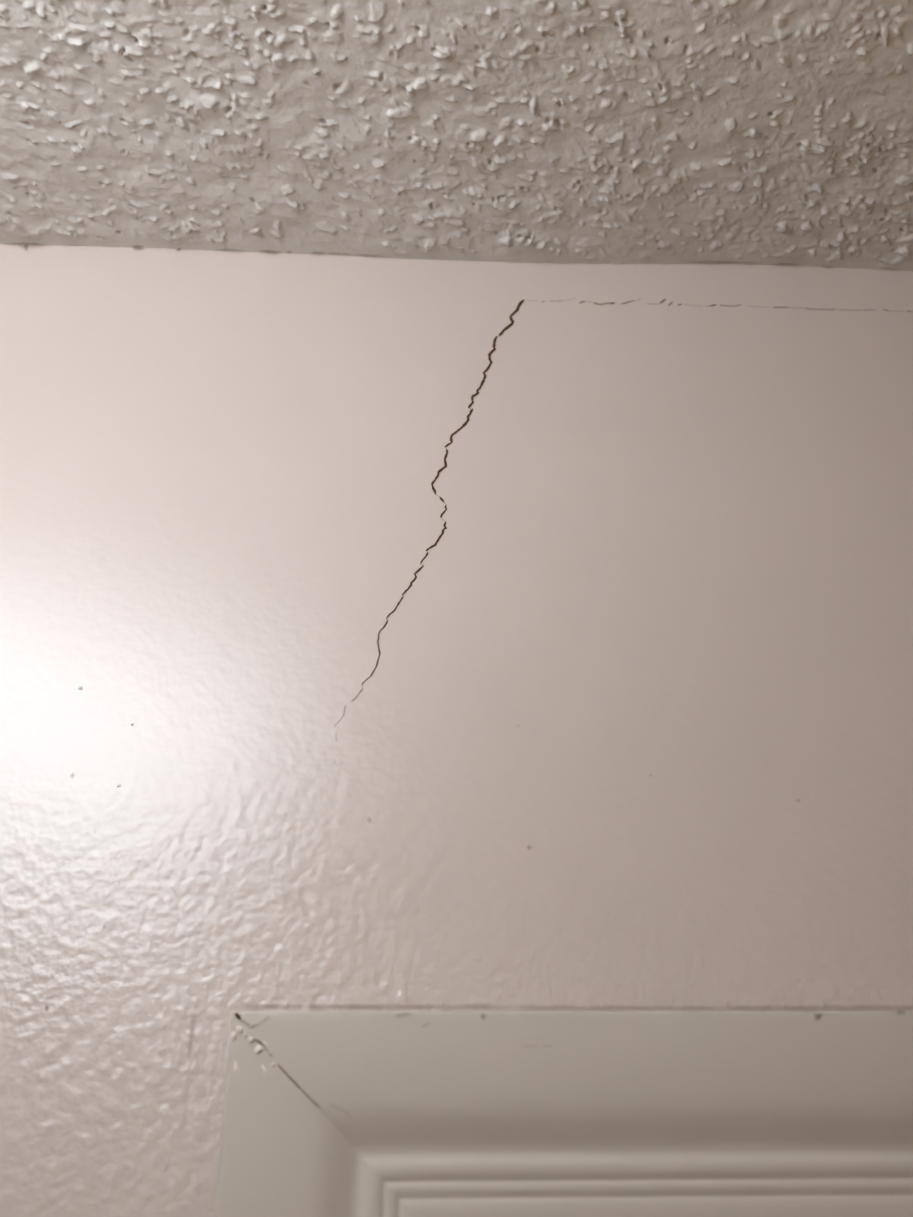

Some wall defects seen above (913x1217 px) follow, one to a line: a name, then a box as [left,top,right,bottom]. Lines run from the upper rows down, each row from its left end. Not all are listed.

crack [359,300,524,693]
crack [235,1012,302,1090]